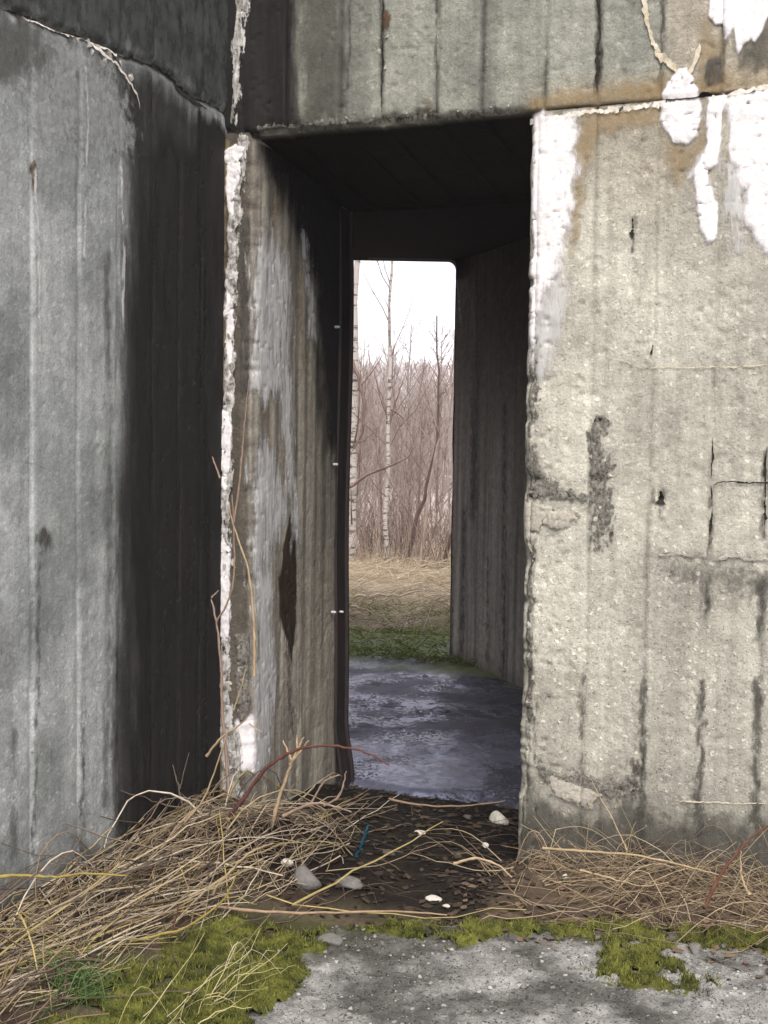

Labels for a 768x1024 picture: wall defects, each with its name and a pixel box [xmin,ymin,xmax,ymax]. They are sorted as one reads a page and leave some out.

crack [0,7,221,112]
leakage [593,8,603,99]
leakage [0,0,351,855]
spalling [524,357,621,722]
crack [708,441,768,548]
leakage [756,578,766,638]
leakage [520,678,768,889]